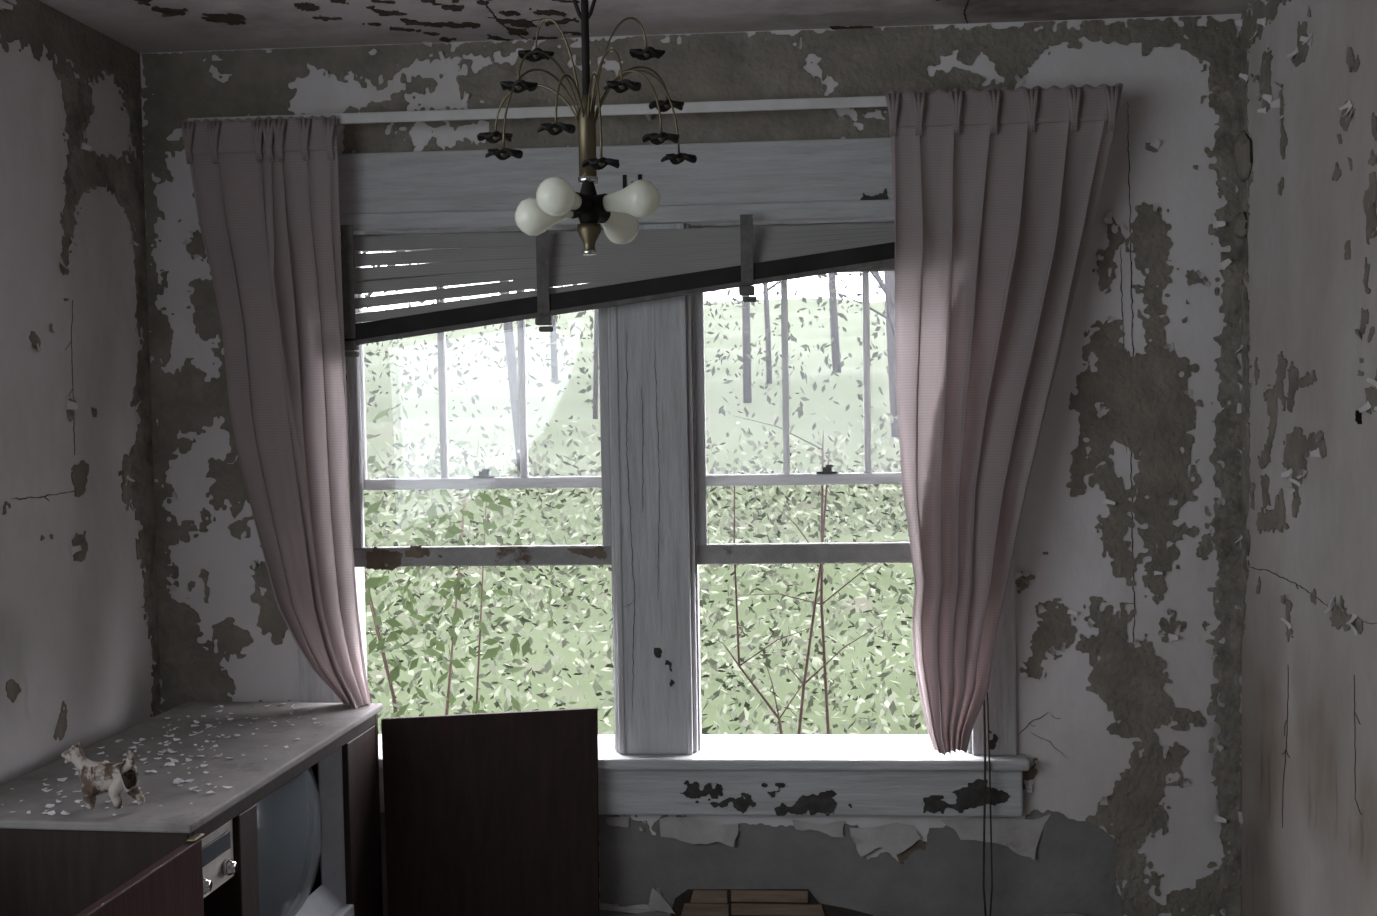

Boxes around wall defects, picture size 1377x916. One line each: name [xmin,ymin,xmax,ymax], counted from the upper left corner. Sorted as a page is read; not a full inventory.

peeling [1346,47,1361,72]
peeling [1332,99,1377,414]
flaking render [0,0,582,717]
peeling [589,0,1327,916]
peeling [567,546,607,560]
crack [1246,566,1329,607]
peeling [1310,589,1364,635]
peeling [53,701,68,741]